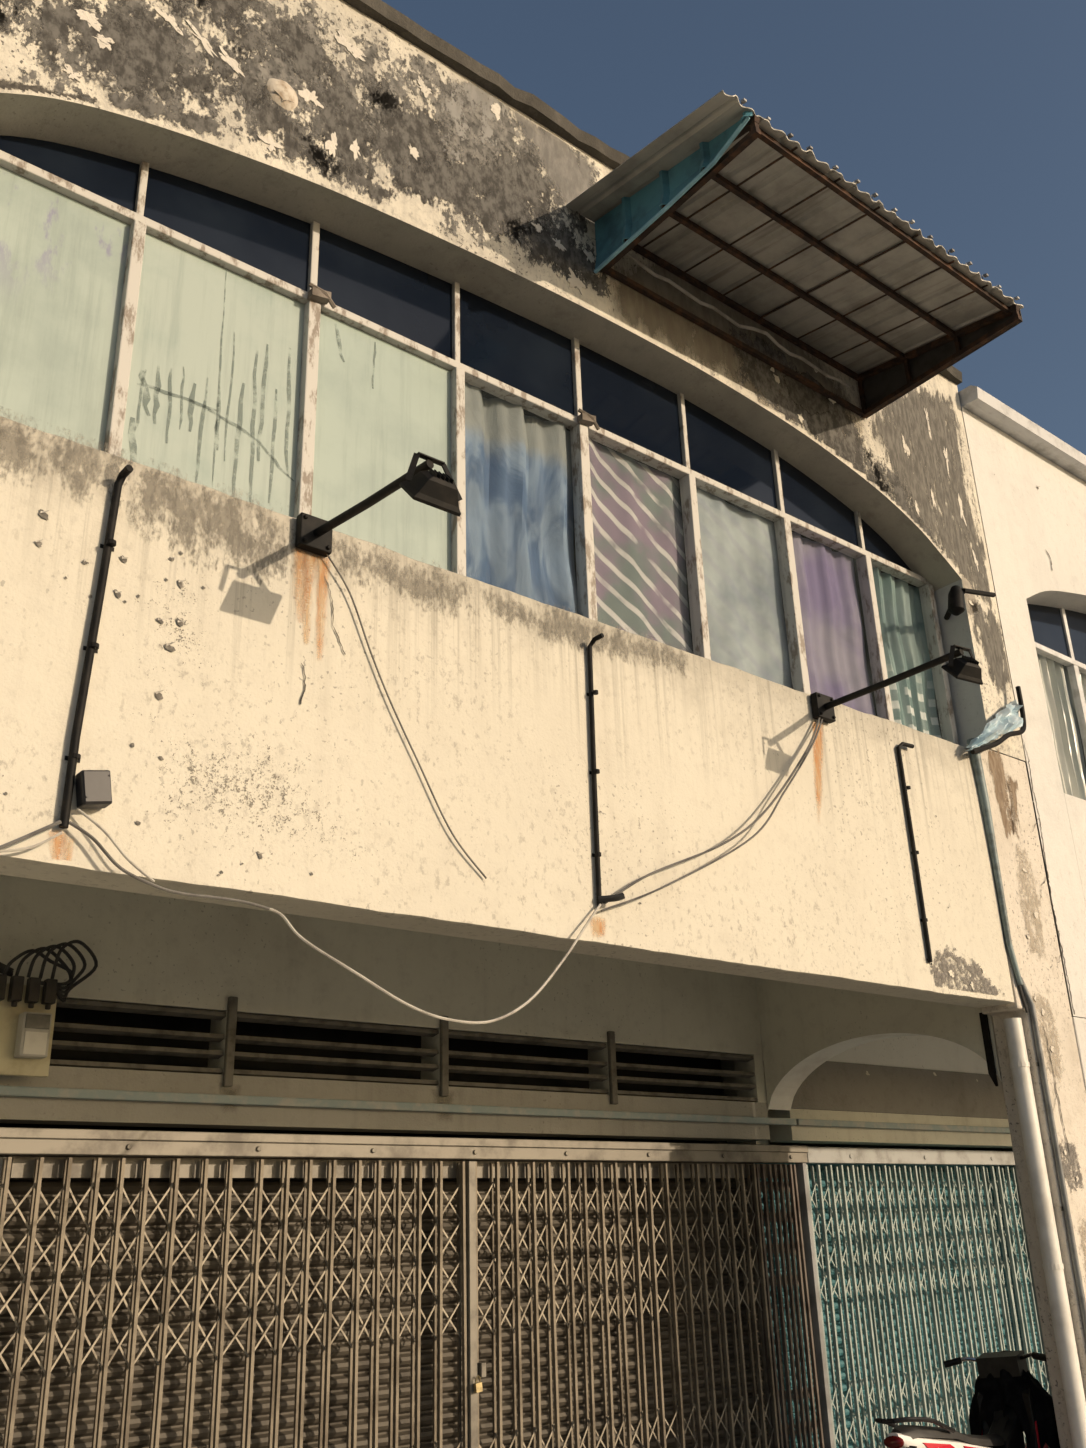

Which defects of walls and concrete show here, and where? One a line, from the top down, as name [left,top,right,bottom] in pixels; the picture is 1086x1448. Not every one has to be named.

water stain [0,0,1012,694]
corrosion [297,550,327,647]
corrosion [813,724,822,799]